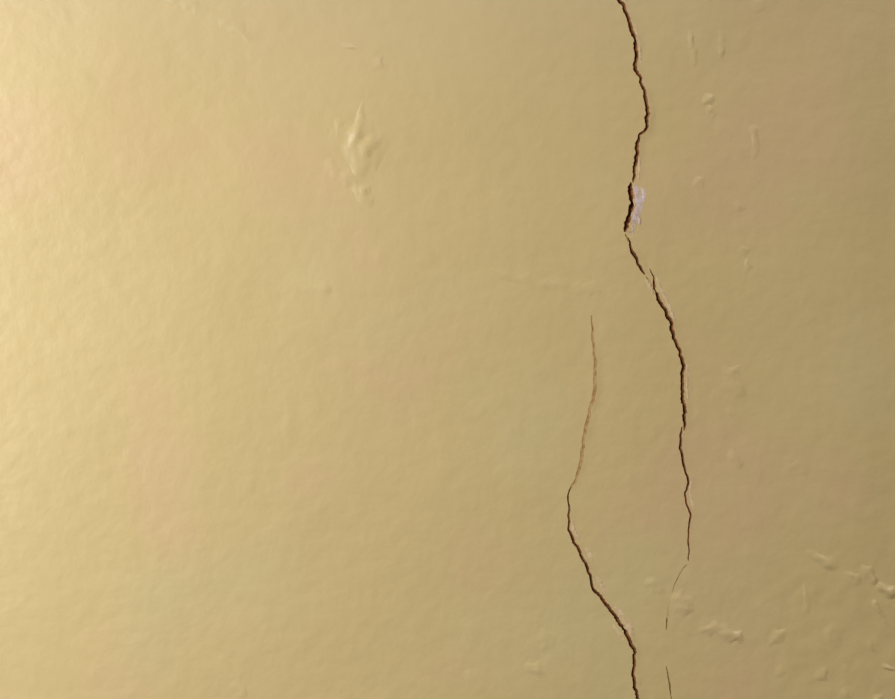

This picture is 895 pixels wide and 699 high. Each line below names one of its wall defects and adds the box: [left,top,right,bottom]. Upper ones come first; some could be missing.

flaking render [631,184,646,234]
crack [613,0,694,630]
crack [567,316,639,699]